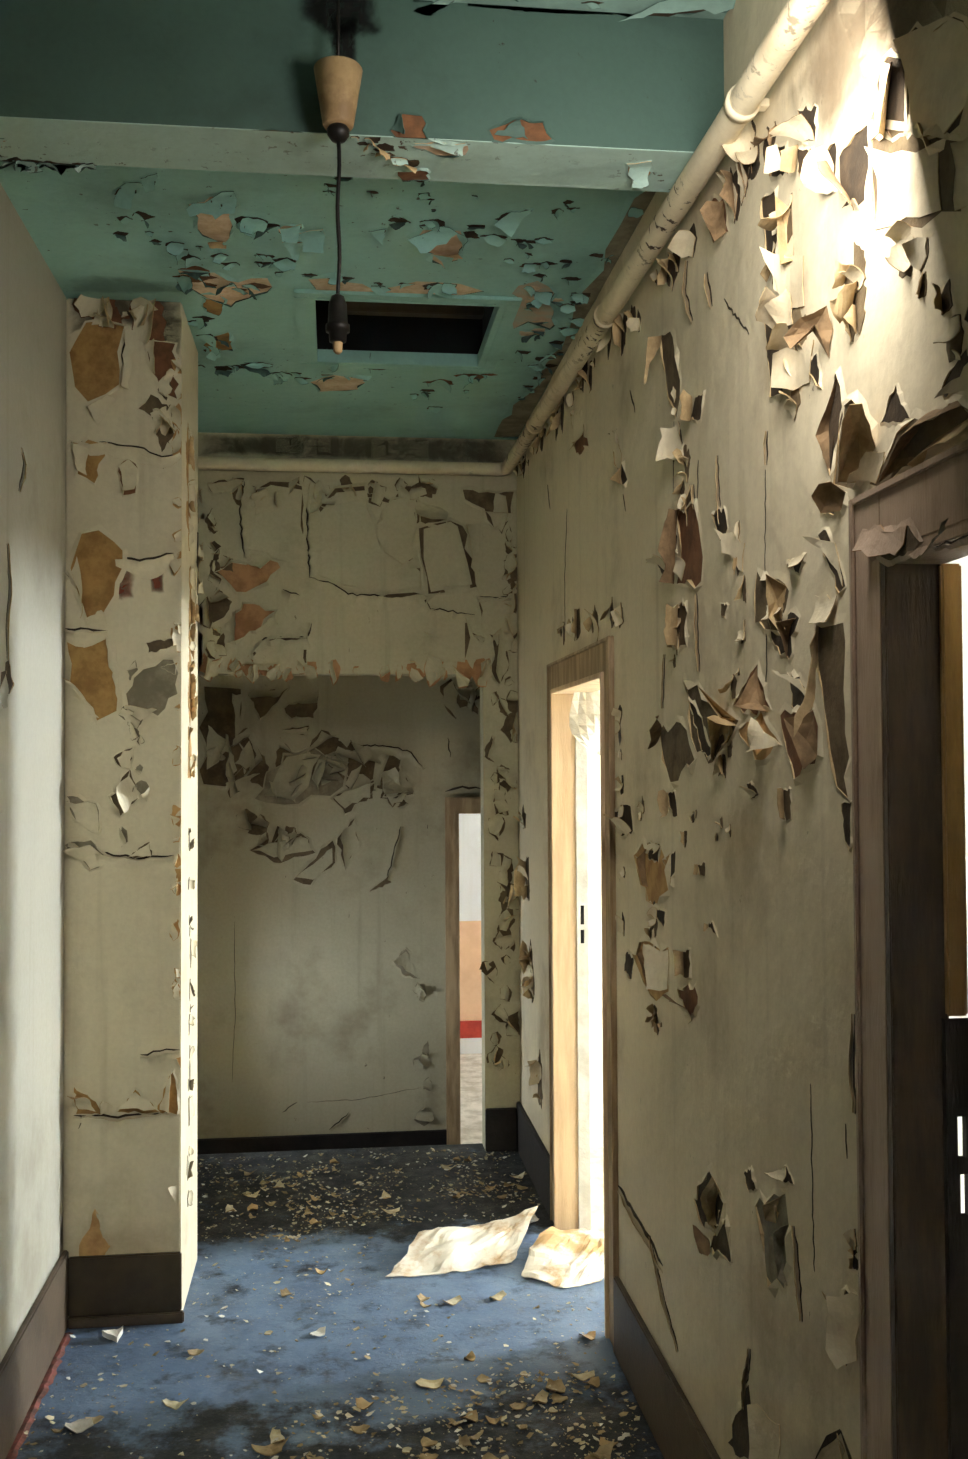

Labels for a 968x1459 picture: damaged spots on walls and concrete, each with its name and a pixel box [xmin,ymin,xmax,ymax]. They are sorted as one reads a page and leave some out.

peeling [0,155,97,175]
peeling [63,6,968,1126]
peeling [0,658,14,712]
peeling [168,1145,194,1206]
crack [616,1185,678,1352]
peeling [693,1163,733,1266]
peeling [744,1163,803,1322]